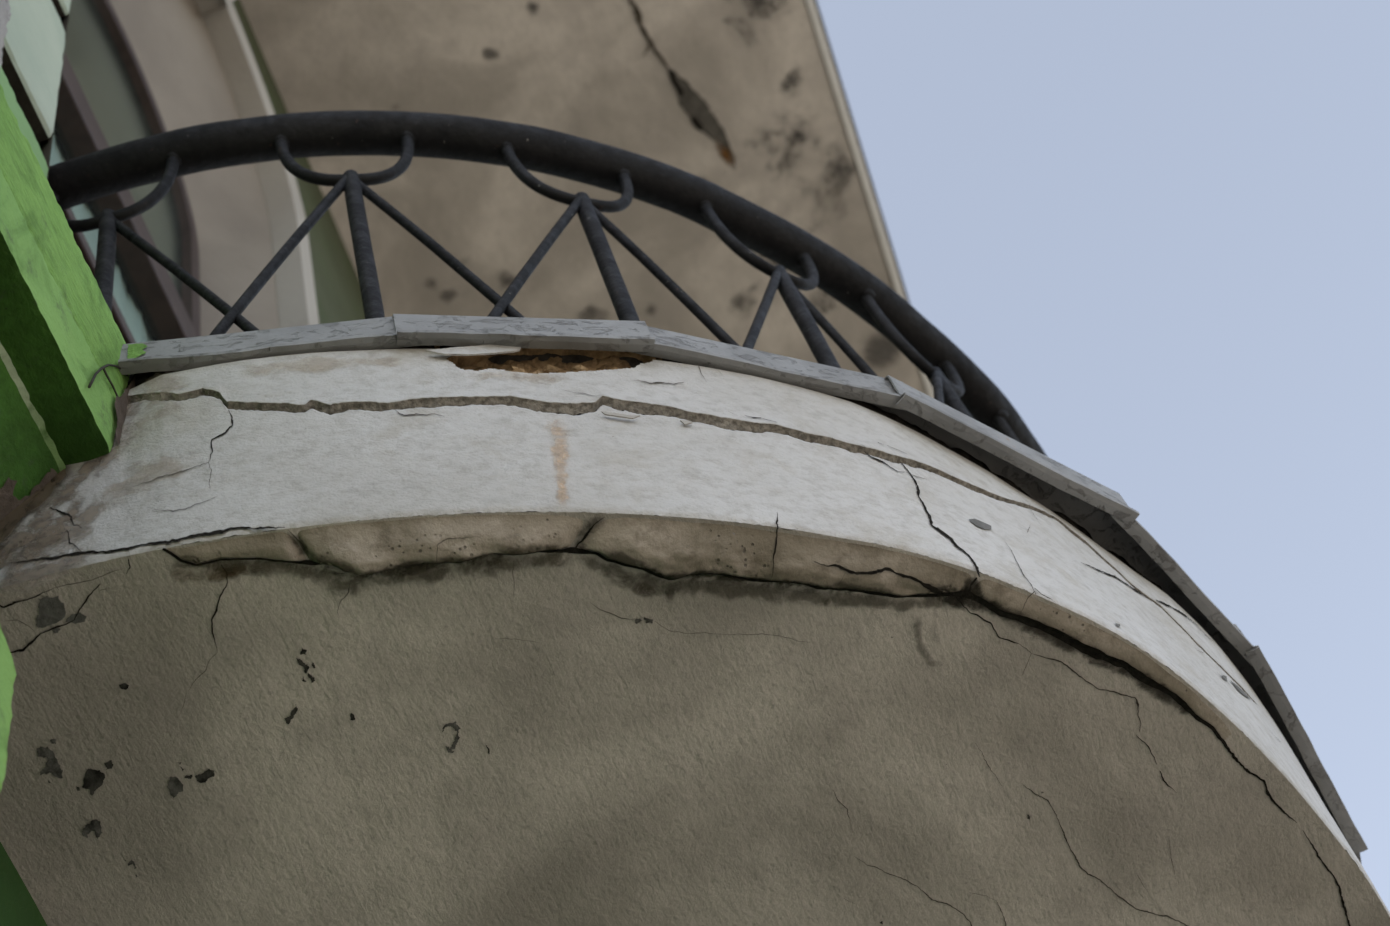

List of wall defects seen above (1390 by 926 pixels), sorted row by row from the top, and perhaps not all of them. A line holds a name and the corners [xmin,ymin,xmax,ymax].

crack [629,0,668,69]
leakage [783,71,800,92]
leakage [778,130,855,199]
spalling [426,345,663,374]
leakage [866,336,899,365]
leakage [184,540,561,593]
spalling [36,596,86,633]
leakage [579,520,1187,713]
crack [0,364,1351,926]
peeling [37,739,113,795]
peeling [167,762,214,800]
peeling [82,819,102,839]